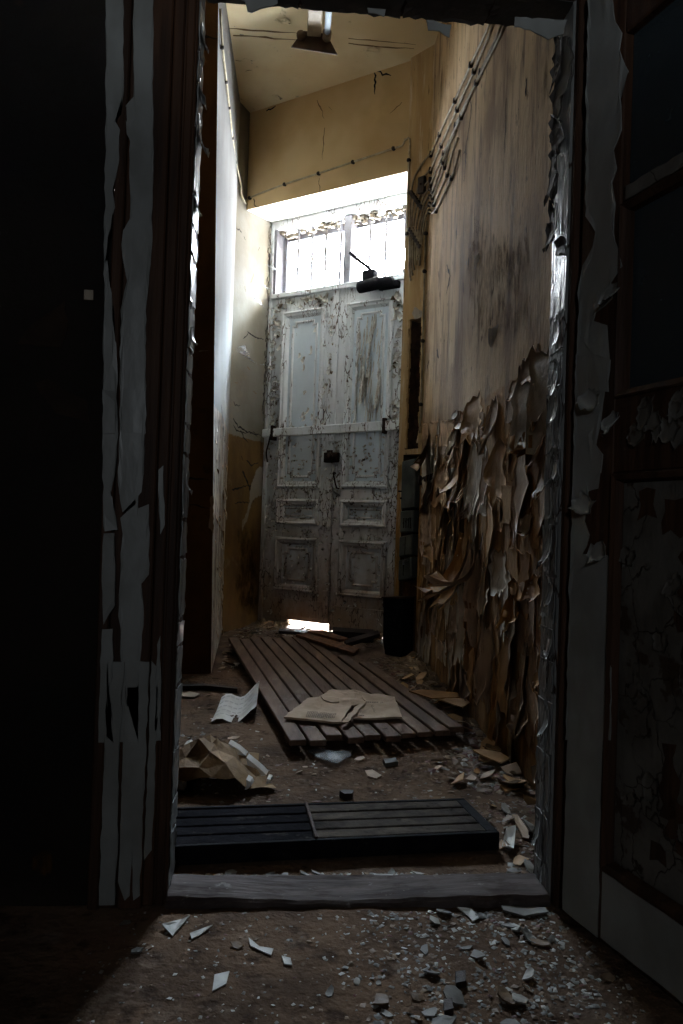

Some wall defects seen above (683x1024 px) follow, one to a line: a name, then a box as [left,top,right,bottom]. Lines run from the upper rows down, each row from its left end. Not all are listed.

crack [205,28,296,71]
crack [348,38,415,111]
peeling [98,0,165,906]
peeling [168,0,596,890]
peeling [575,388,620,437]
peeling [644,387,683,450]